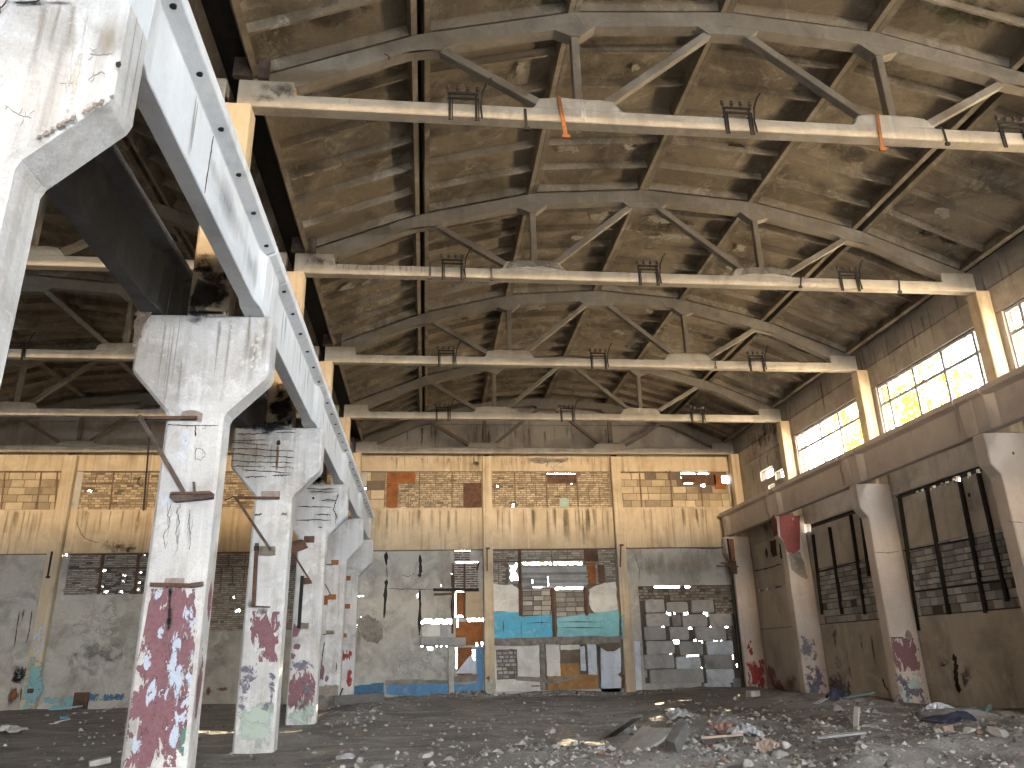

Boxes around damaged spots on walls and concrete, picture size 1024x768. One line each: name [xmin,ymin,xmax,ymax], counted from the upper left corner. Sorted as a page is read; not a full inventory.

crack [167,424,339,528]
crack [163,502,193,553]
peeling [765,514,808,579]
peeling [89,584,227,768]
peeling [238,611,280,749]
peeling [288,623,353,725]
spalling [357,614,383,644]
peeling [746,640,783,691]
peeling [800,636,851,694]
peeling [891,630,928,704]